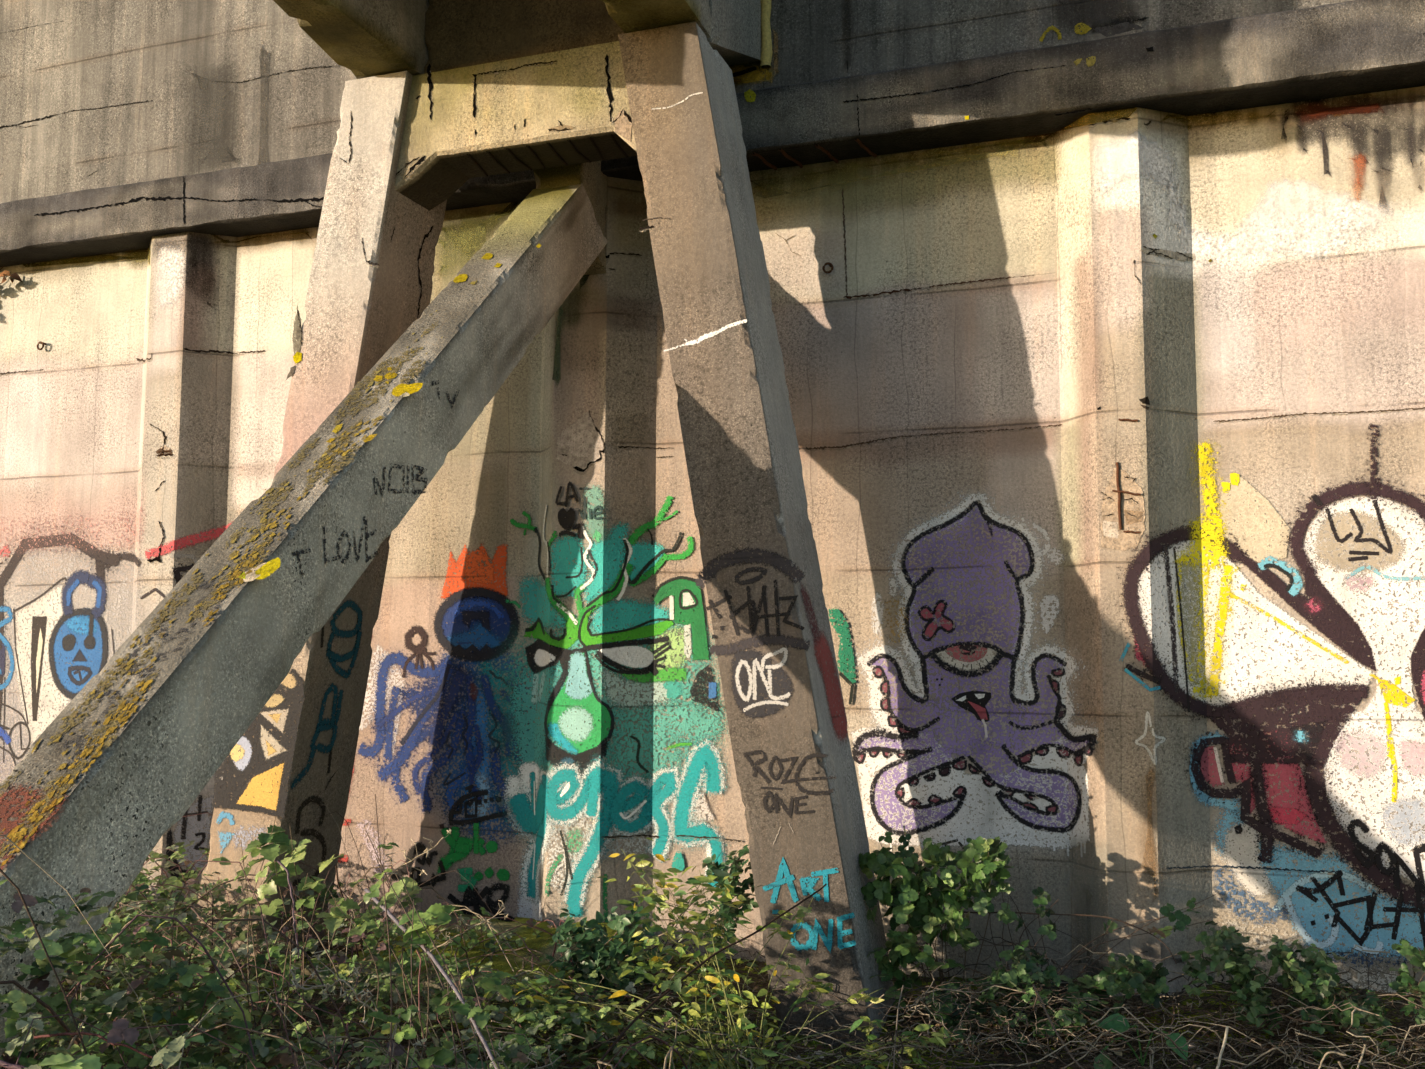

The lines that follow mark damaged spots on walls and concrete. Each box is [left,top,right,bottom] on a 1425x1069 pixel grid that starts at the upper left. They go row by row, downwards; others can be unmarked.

crack [605,55,614,124]
crack [651,92,703,110]
spalling [556,412,604,468]
spalling [1100,462,1145,551]